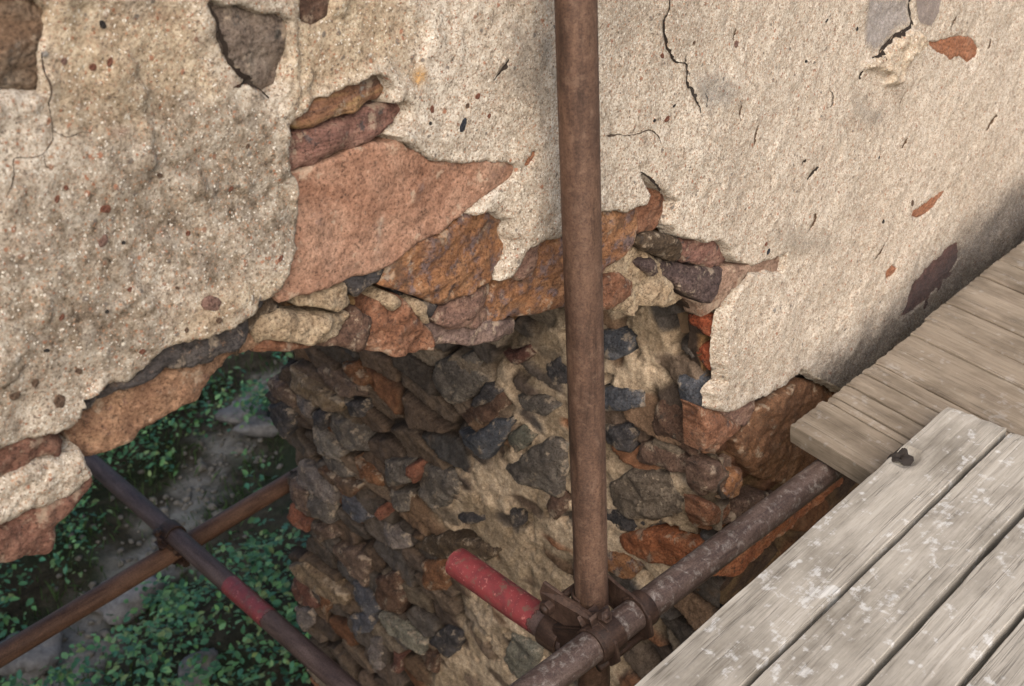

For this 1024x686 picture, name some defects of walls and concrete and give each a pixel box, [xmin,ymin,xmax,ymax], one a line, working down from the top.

crack [663,0,708,113]
crack [872,0,914,60]
crack [6,53,89,198]
flaking render [249,75,565,358]
flaking render [601,188,779,317]